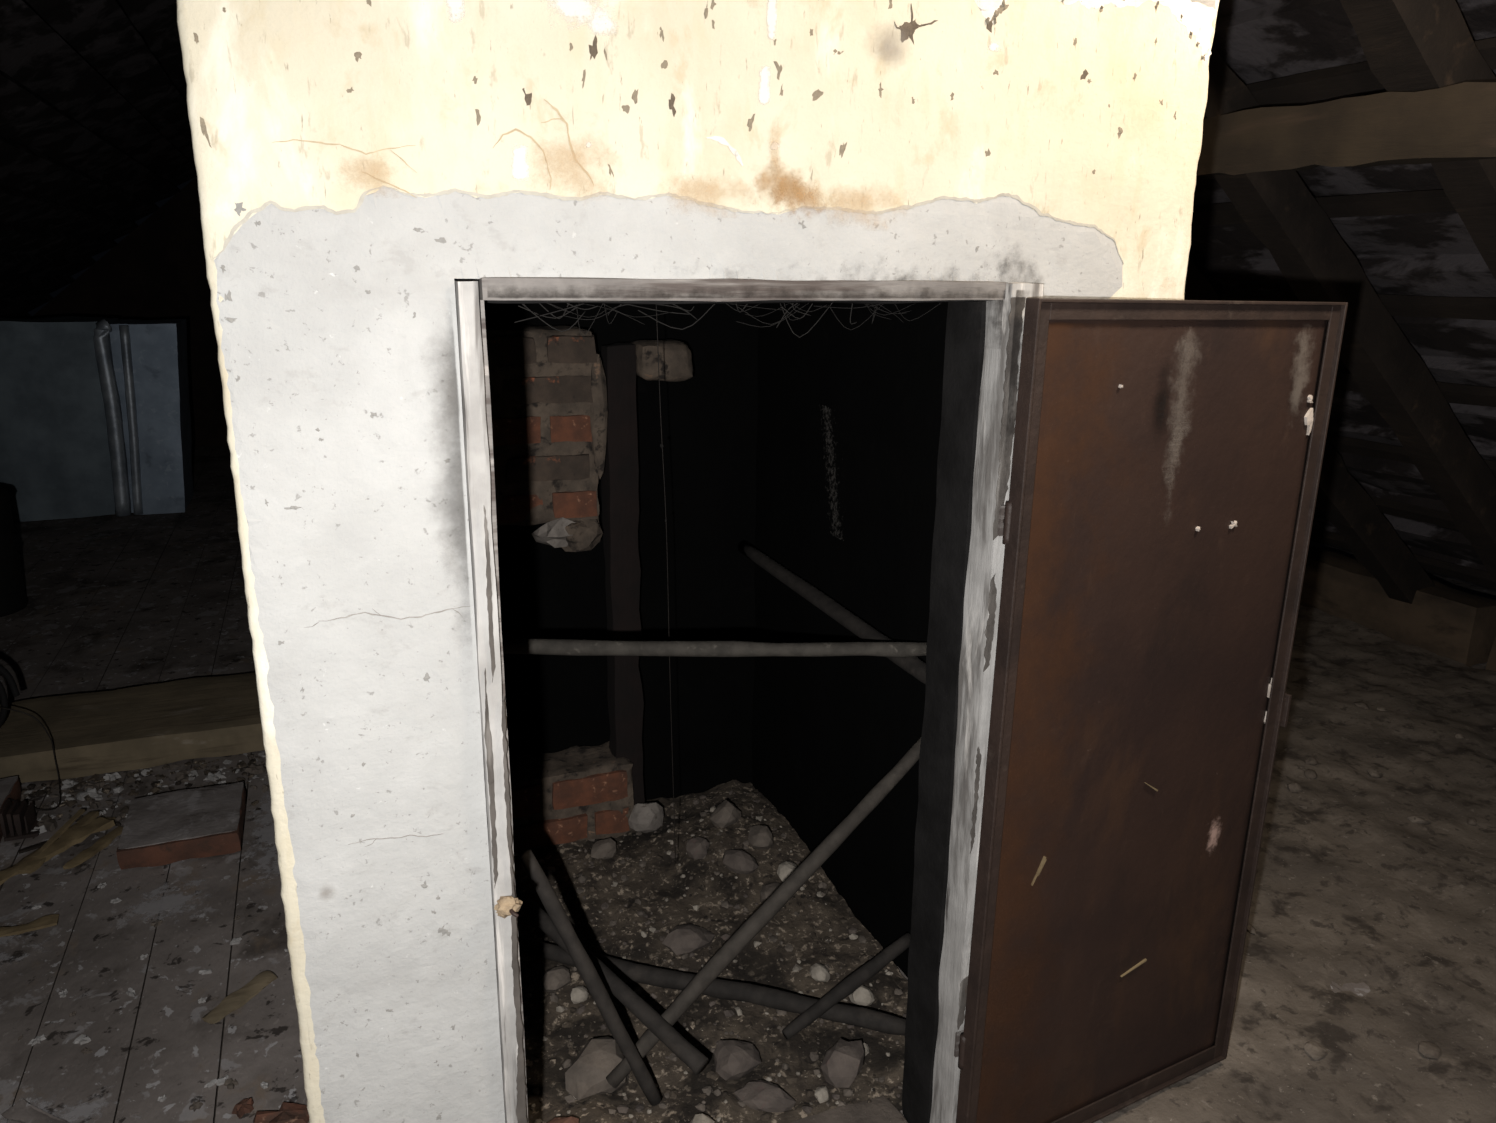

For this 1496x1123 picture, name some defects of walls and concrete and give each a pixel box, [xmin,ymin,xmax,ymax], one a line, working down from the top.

flaking render [975,0,1009,33]
flaking render [1057,0,1216,61]
leakage [762,174,816,203]
flaking render [234,202,261,227]
crack [304,606,470,628]